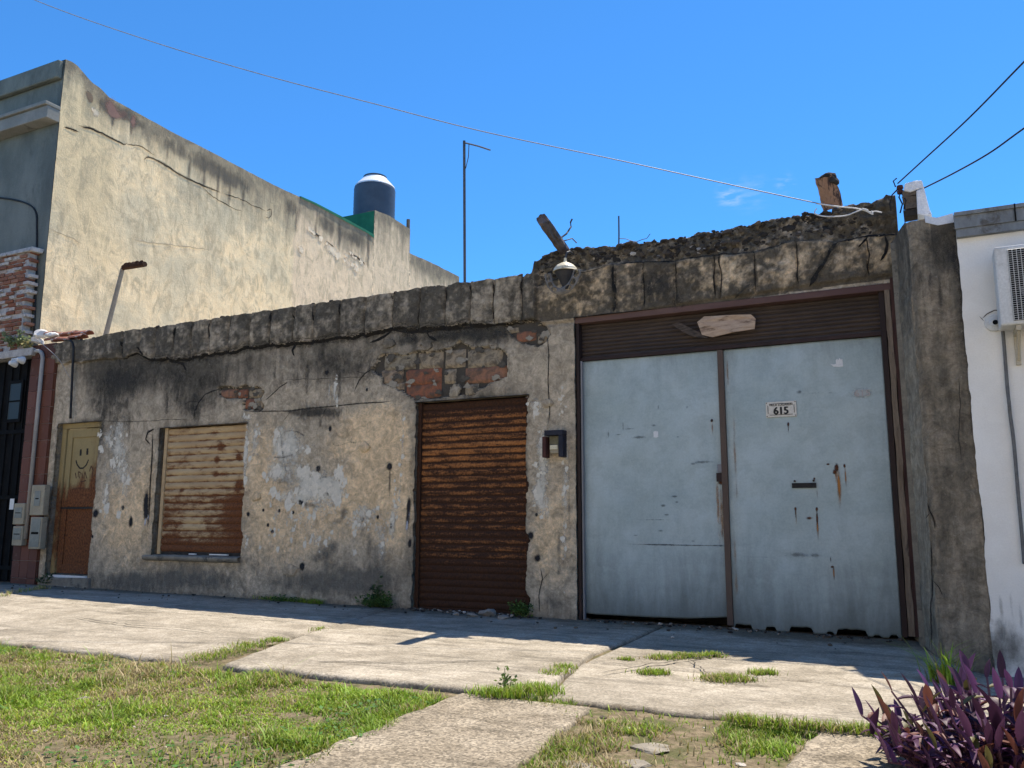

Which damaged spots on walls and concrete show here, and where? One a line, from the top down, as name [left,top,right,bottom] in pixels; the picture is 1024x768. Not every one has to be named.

crack [65,125,272,218]
leakage [167,142,248,199]
crack [555,234,897,311]
crack [120,280,528,420]
flaking render [372,342,508,400]
flaking render [505,320,551,347]
peeling [220,385,349,553]
corrosion [827,463,846,498]